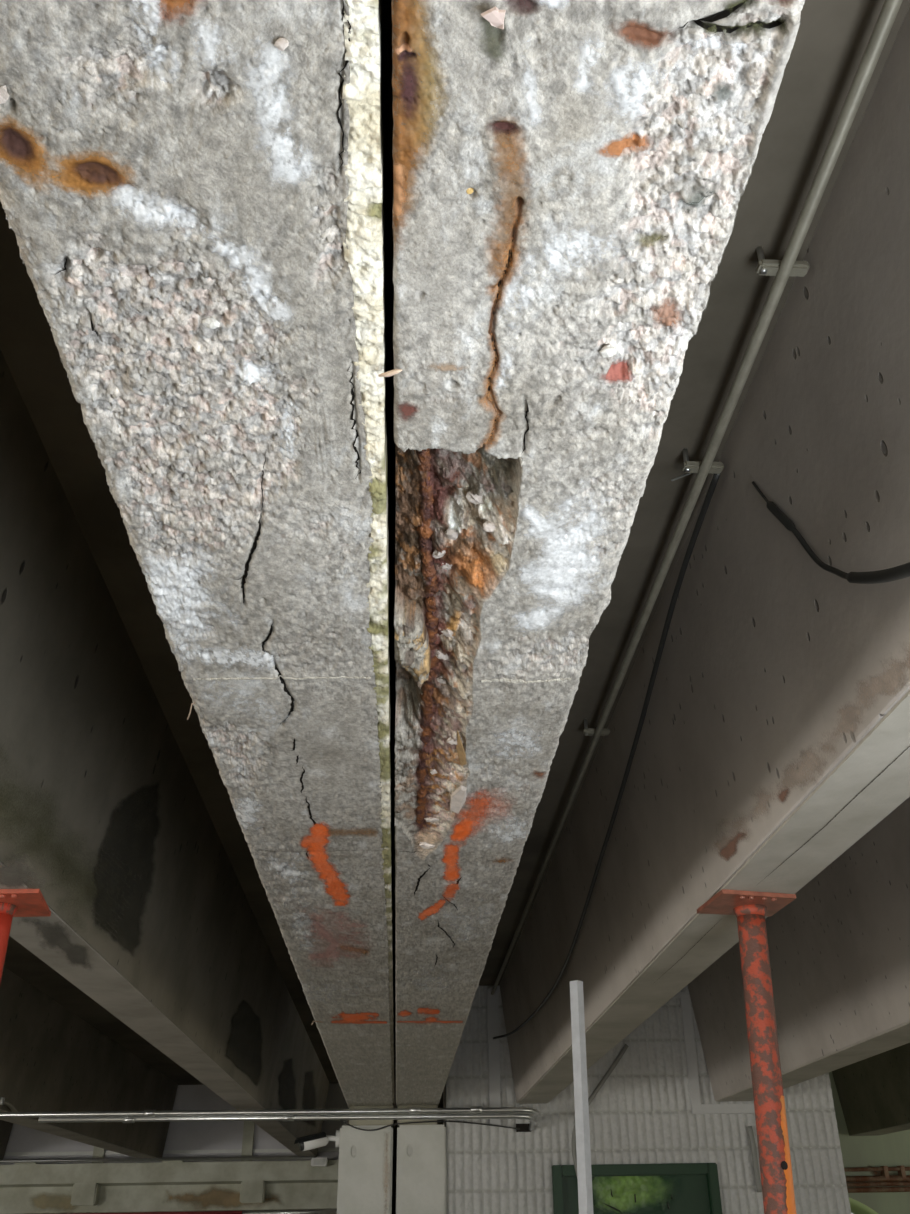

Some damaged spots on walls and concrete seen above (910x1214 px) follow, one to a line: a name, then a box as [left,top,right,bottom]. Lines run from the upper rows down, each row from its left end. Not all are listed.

corrosion [157,0,195,16]
crack [677,0,787,33]
corrosion [0,124,130,195]
corrosion [391,0,442,241]
crack [488,228,514,435]
corrosion [480,122,524,449]
crack [236,453,266,603]
spalling [394,445,523,859]
crack [258,624,316,859]
leakage [94,785,159,955]
leakage [226,1000,262,1085]
leakage [279,1059,316,1125]